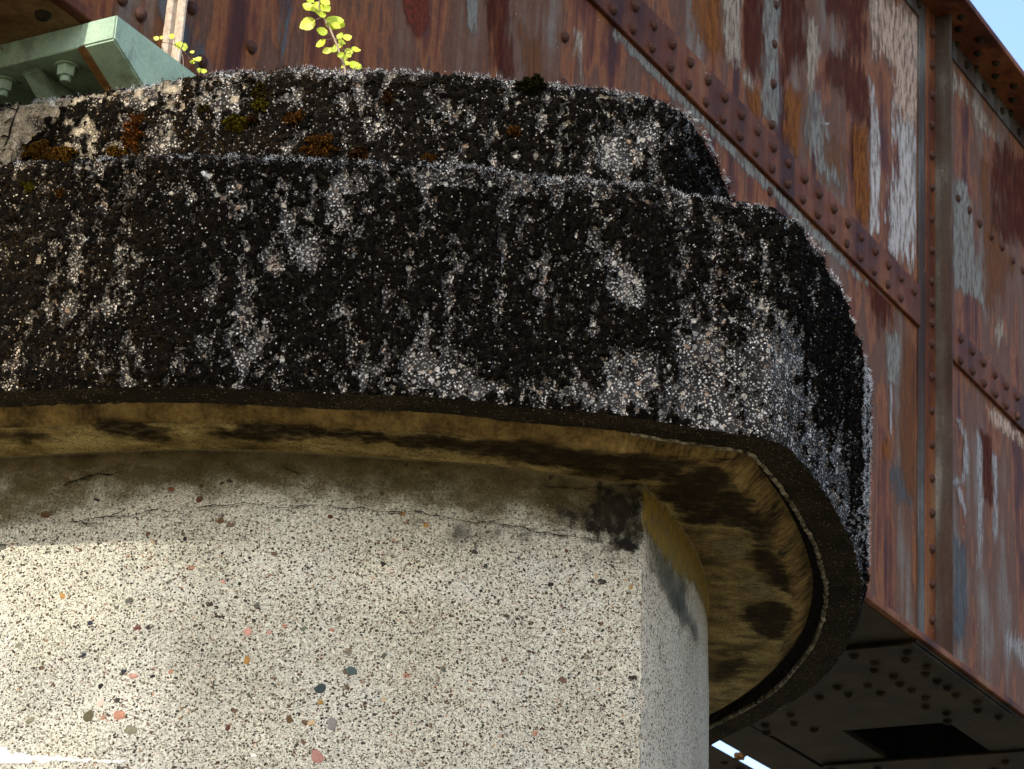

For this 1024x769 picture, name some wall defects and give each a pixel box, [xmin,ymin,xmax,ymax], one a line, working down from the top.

rust [691,0,724,65]
rust [741,0,766,121]
rust [780,0,807,158]
rust [824,0,870,225]
rust [982,140,1024,313]
damp [92,418,171,443]
damp [207,421,797,642]
rust [883,336,916,500]
rust [981,429,993,507]